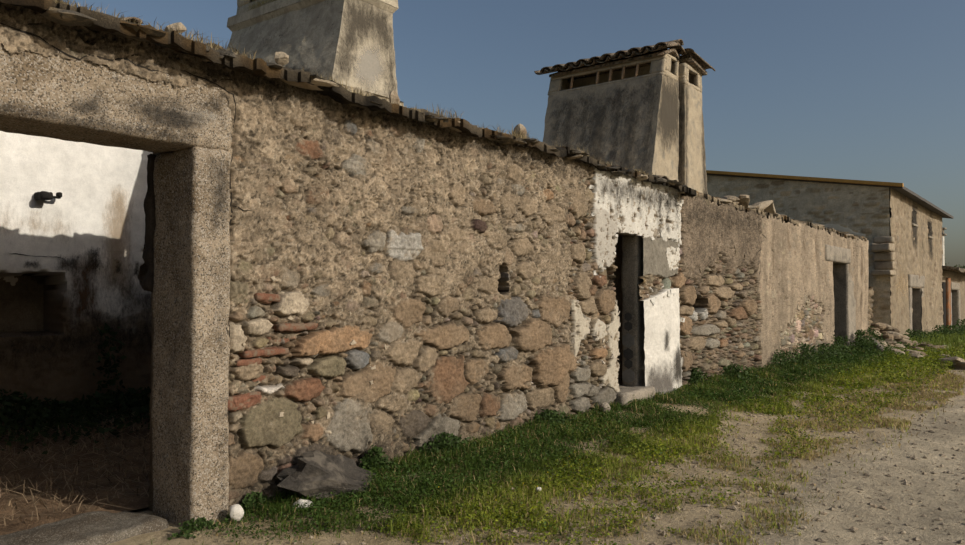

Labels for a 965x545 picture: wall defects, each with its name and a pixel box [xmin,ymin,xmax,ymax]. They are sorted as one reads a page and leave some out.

crack [0,22,236,130]
damp [2,250,151,368]
peeling [569,289,621,392]
spalling [586,168,763,394]